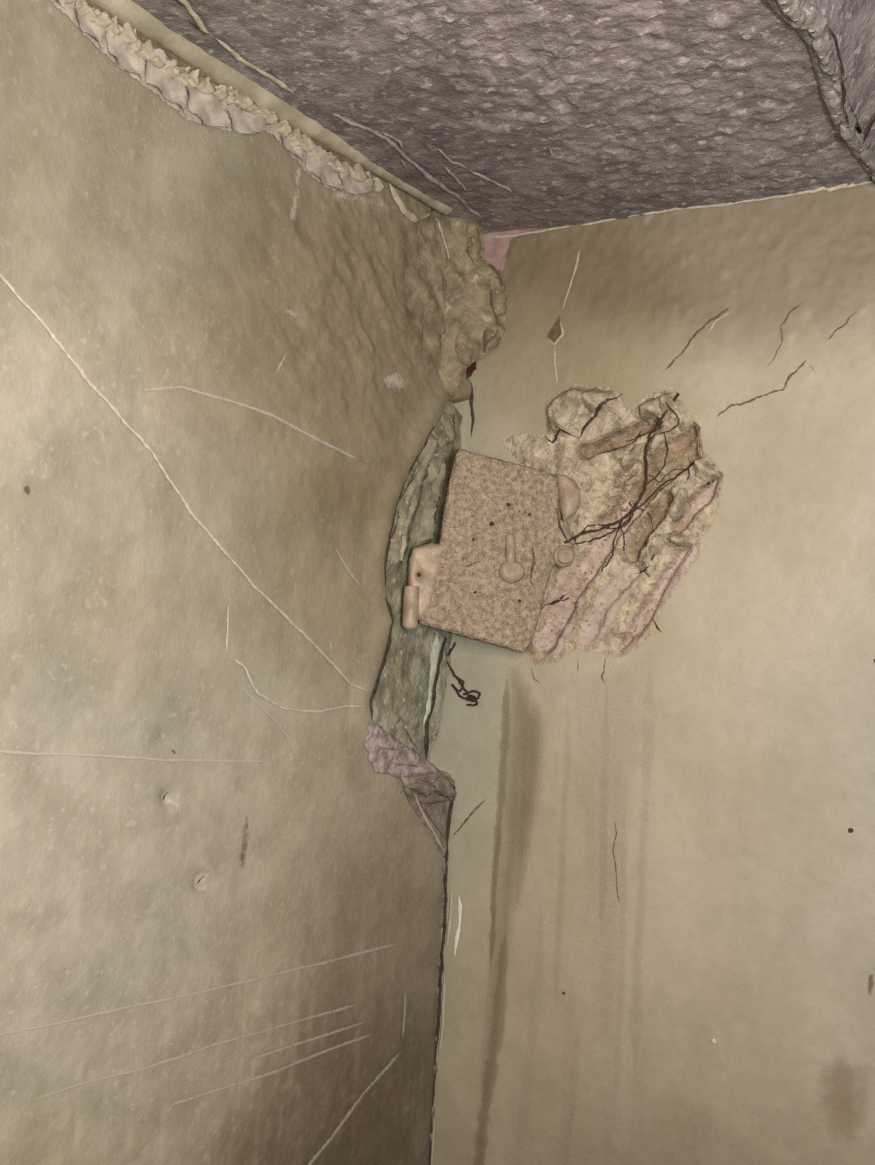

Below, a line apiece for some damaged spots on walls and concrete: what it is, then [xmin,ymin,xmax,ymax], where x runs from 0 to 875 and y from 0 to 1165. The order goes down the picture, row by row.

peeling [50,0,387,219]
crack [547,181,875,383]
crack [718,305,814,416]
spalling [365,401,463,857]
spalling [499,384,724,681]